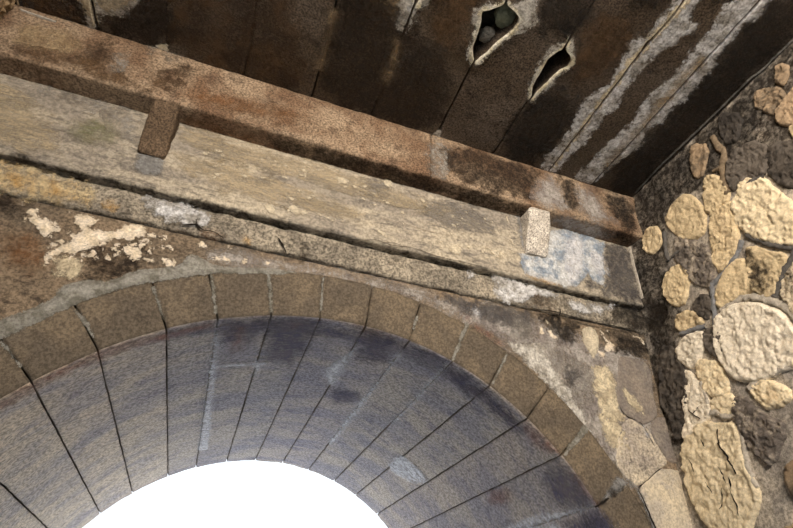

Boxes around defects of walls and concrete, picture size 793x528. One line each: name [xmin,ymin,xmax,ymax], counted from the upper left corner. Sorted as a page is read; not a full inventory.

damp [79,0,180,54]
spalling [466,0,538,65]
spalling [526,36,575,102]
damp [0,84,373,249]
damp [85,240,145,280]
damp [169,0,793,473]
crack [688,429,739,516]